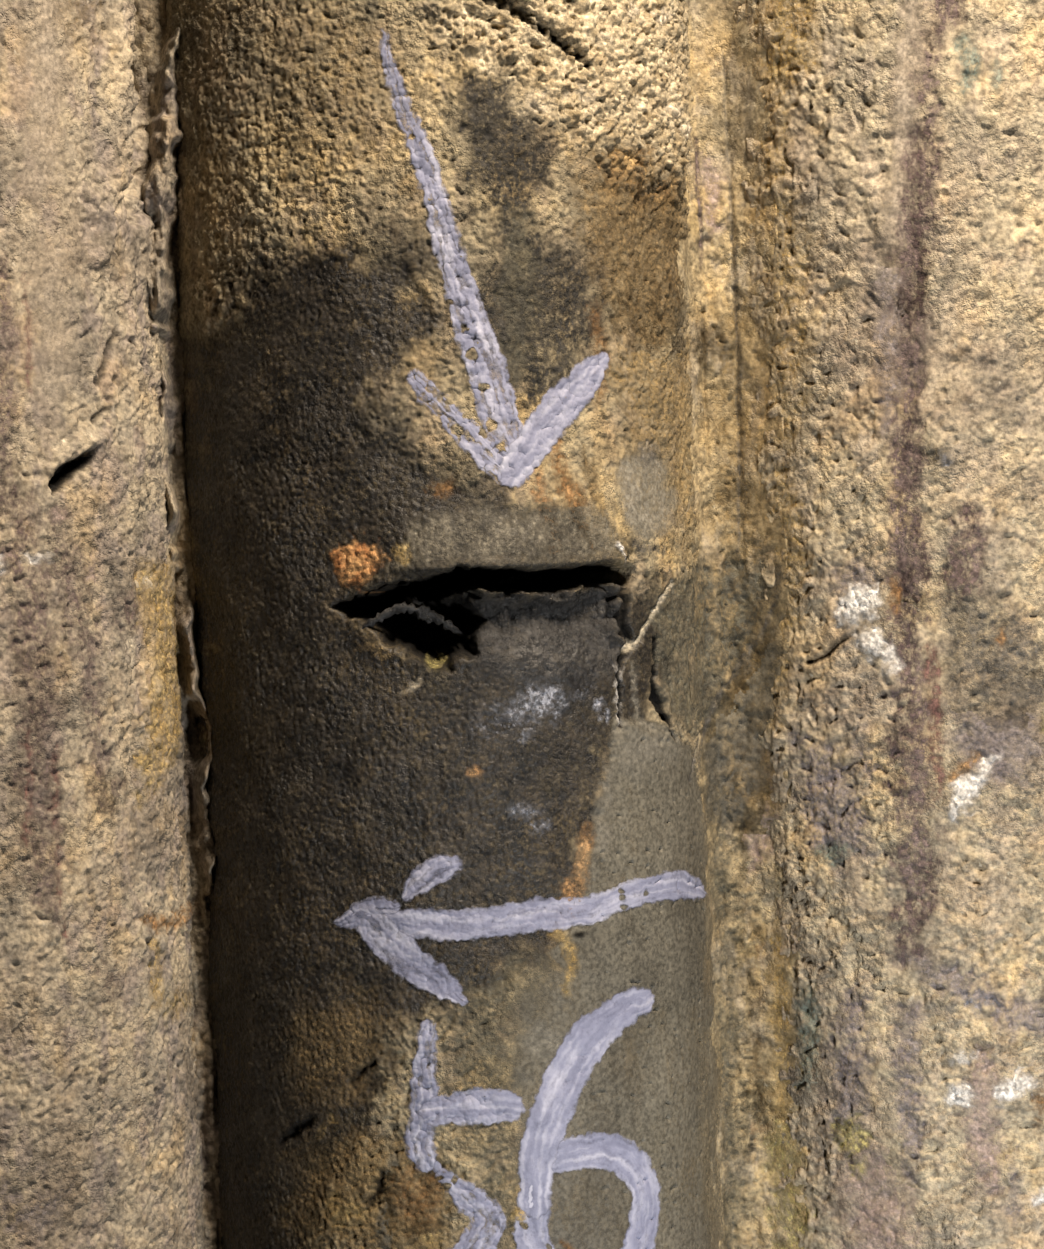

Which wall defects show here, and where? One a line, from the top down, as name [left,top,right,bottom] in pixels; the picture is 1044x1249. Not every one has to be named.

crack [482,0,588,68]
corrosion [330,542,410,585]
crack [356,504,781,783]
leakage [791,0,1044,1032]
peeling [444,556,781,1249]